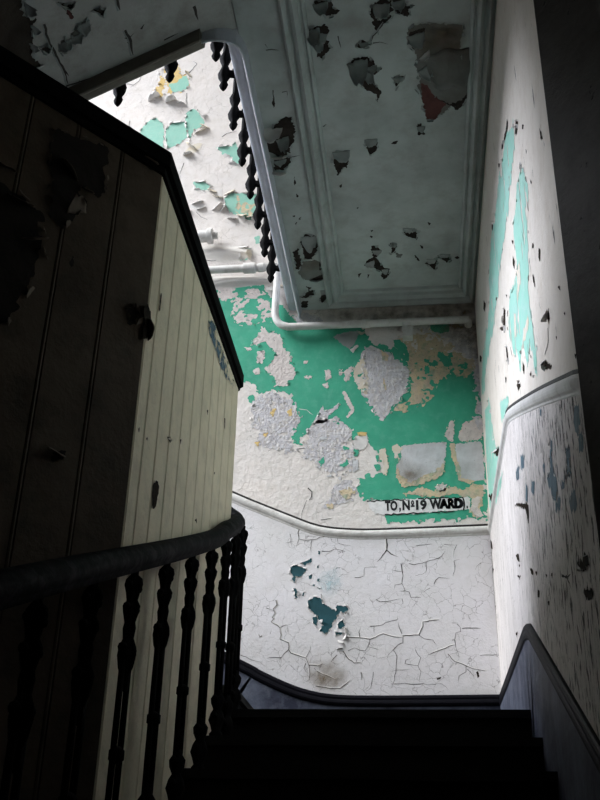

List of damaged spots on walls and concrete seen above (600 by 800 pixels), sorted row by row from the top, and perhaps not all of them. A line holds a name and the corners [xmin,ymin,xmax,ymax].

peeling [0,0,106,69]
peeling [140,65,209,157]
peeling [307,0,340,60]
peeling [347,0,470,135]
peeling [190,180,257,222]
peeling [216,117,552,524]
peeling [543,403,584,514]
peeling [289,551,349,650]
crack [241,539,501,691]